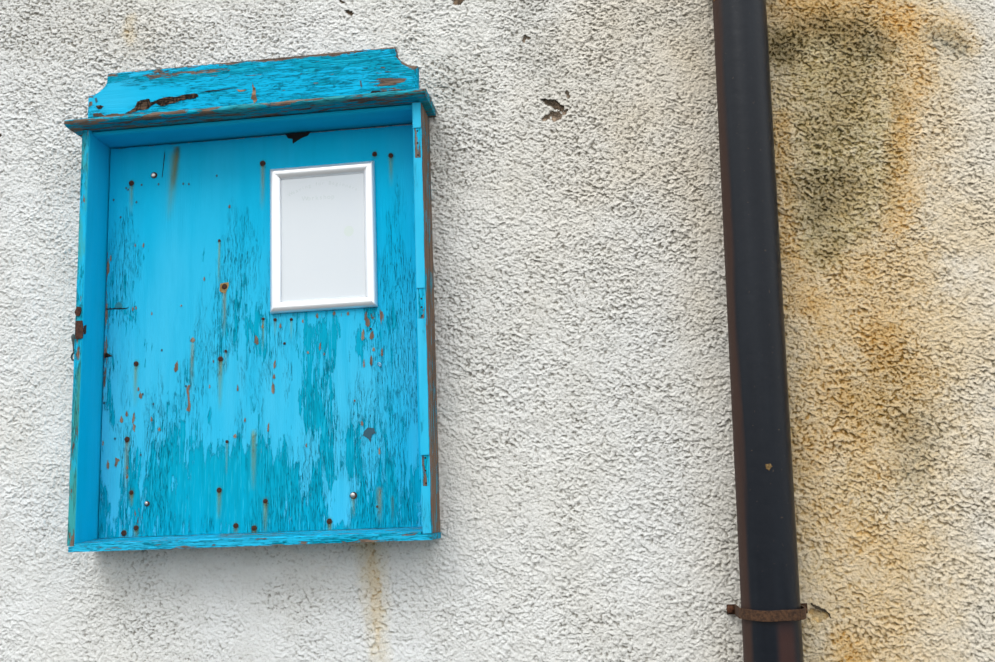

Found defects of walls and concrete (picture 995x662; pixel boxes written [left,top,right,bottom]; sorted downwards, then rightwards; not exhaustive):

spalling [541,91,570,122]